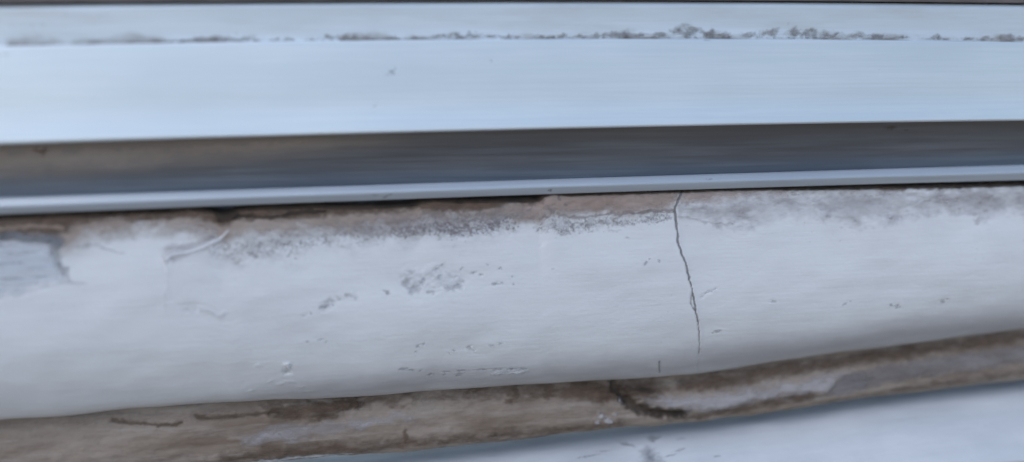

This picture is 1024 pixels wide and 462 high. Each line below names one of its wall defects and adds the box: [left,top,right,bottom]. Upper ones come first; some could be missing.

damp [0,190,759,247]
crack [674,193,700,350]
damp [829,348,1024,395]